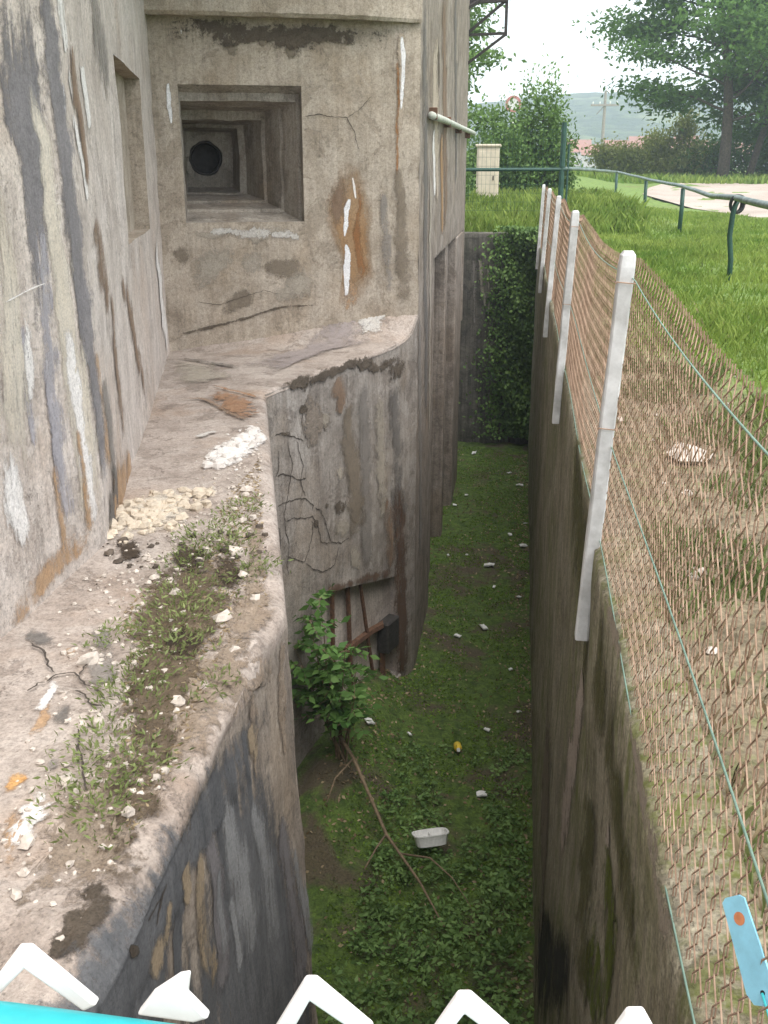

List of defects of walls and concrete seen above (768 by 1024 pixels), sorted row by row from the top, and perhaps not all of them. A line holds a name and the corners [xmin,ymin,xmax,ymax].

leakage [168,17,389,58]
crack [308,100,368,148]
leakage [0,0,145,525]
corrosion [331,174,370,309]
spalling [283,355,405,454]
corrosion [16,432,92,623]
crack [275,398,349,574]
spalling [326,500,352,536]
crack [27,643,105,706]
crack [76,729,87,790]
leakage [39,714,315,1024]
leakage [533,669,585,1022]